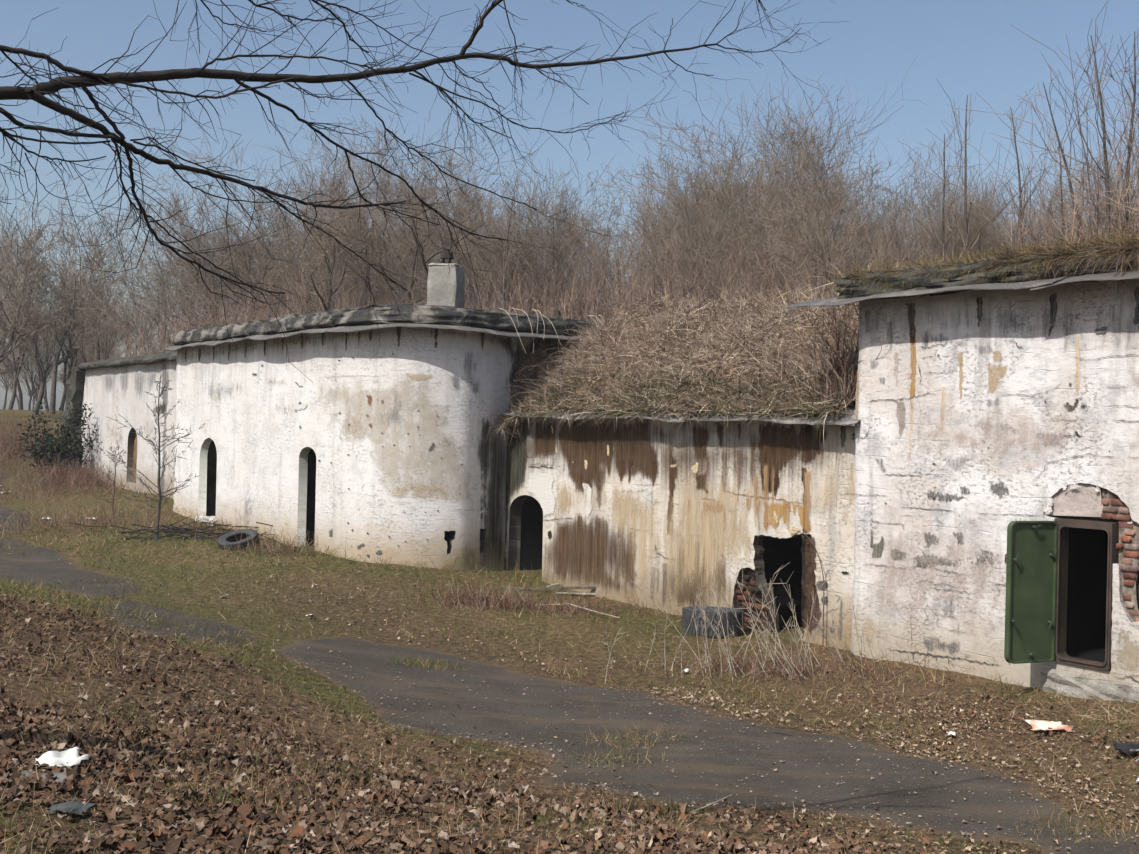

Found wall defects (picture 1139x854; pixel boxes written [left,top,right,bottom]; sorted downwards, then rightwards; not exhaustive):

crack [869,343,953,410]
leakage [330,373,467,494]
crack [1033,419,1139,480]
leakage [448,420,826,587]
crack [823,473,1044,526]
leakage [651,544,725,606]
flaking render [732,536,773,631]
flaking render [773,511,828,640]
rust [808,596,821,634]
flaking render [1043,483,1139,623]